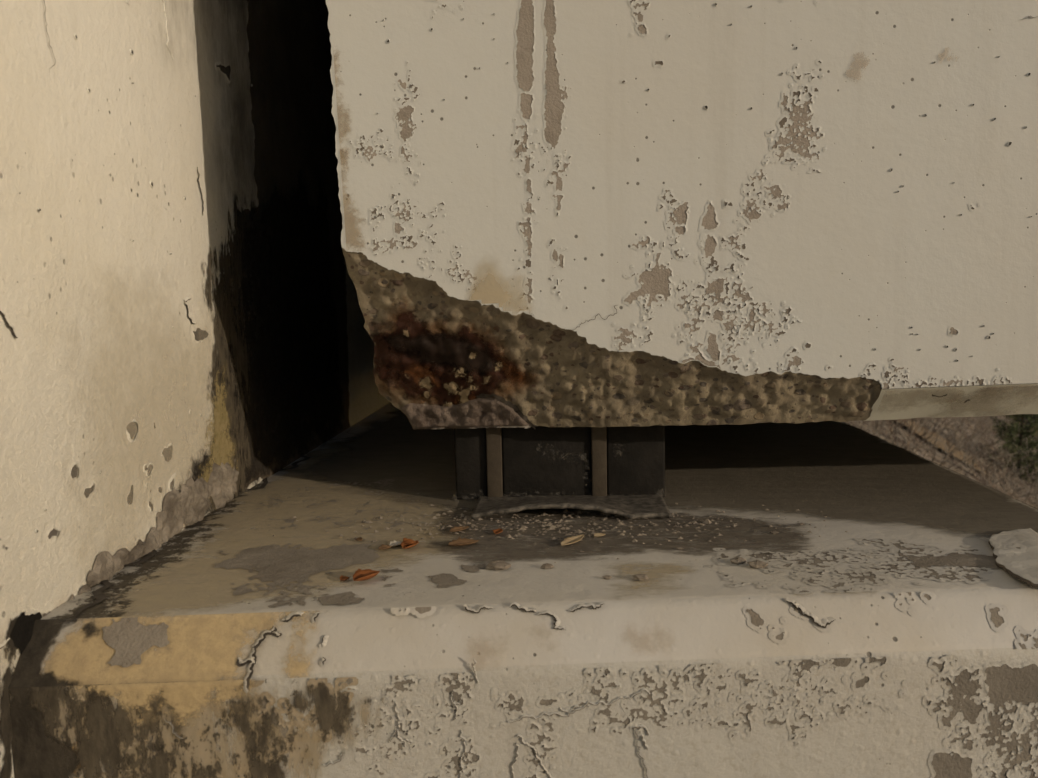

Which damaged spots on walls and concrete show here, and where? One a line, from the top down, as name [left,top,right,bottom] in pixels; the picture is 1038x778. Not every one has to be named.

rust [370,309,535,406]
water stain [405,352,502,407]
spalling [43,0,1014,618]
water stain [0,175,457,778]
crack [786,597,835,628]
peeling [707,538,1000,645]
peeling [209,672,486,778]
crack [389,702,412,747]
crack [450,657,479,778]
crack [508,688,650,778]
peeling [490,657,910,778]
peeling [922,603,1038,778]